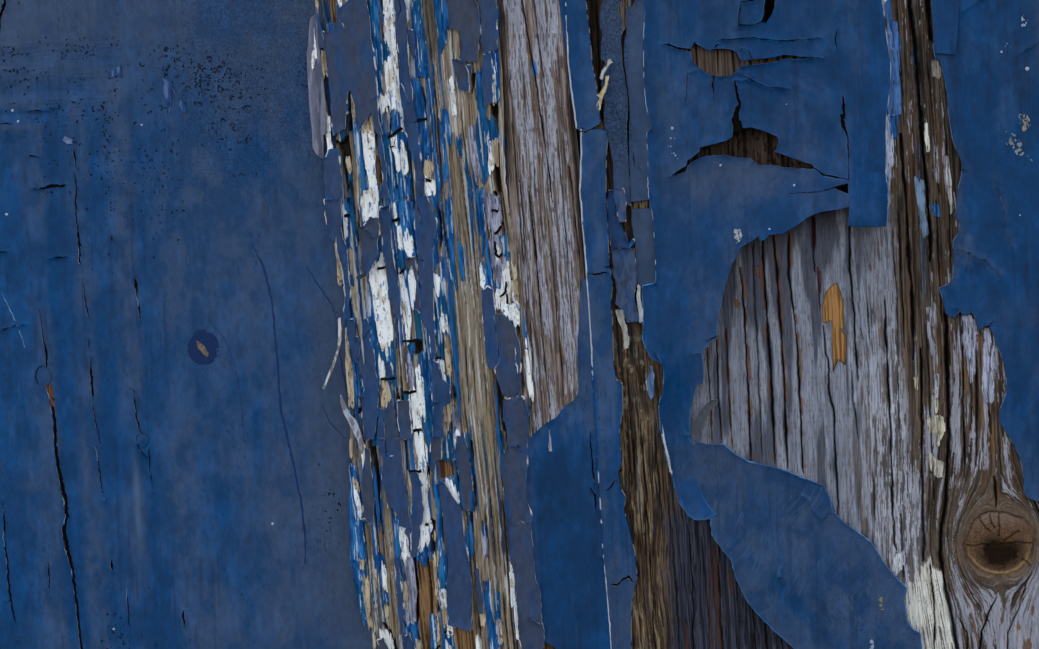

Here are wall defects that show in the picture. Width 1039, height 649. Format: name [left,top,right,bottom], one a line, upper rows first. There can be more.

crack [0,0,8,29]
crack [1,311,48,366]
peeling [297,0,555,649]
peeling [597,0,923,649]
peeling [926,307,936,361]
peeling [960,314,997,404]
peeling [927,373,946,478]
crack [3,508,16,621]
crack [48,398,83,649]